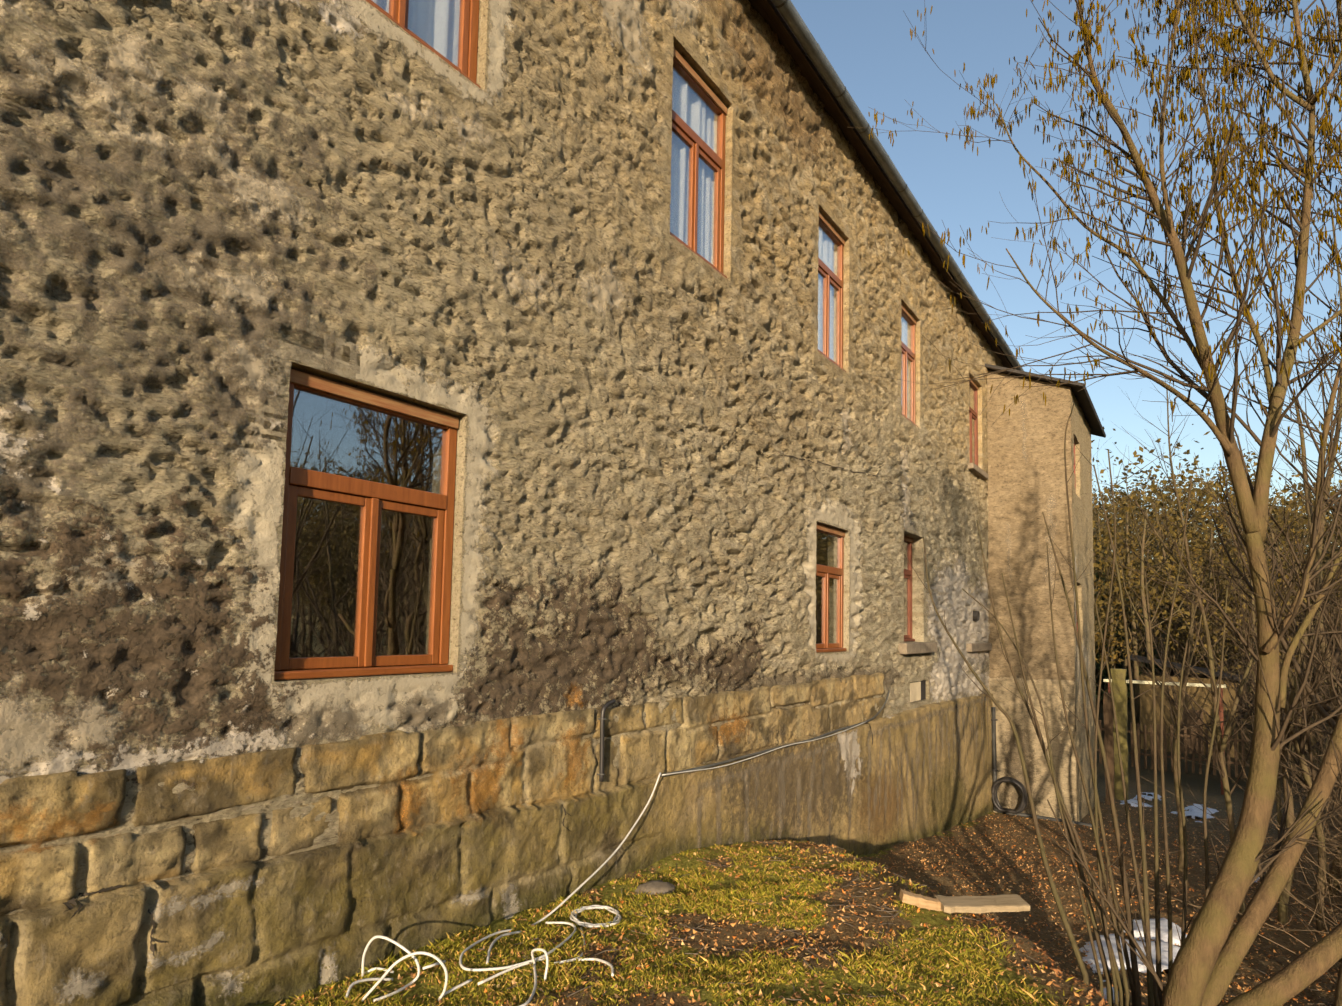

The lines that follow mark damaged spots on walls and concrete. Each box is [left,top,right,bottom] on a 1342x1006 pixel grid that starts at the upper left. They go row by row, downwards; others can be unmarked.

damp [0,0,376,796]
damp [429,554,766,729]
crack [63,885,124,919]
crack [148,909,167,956]